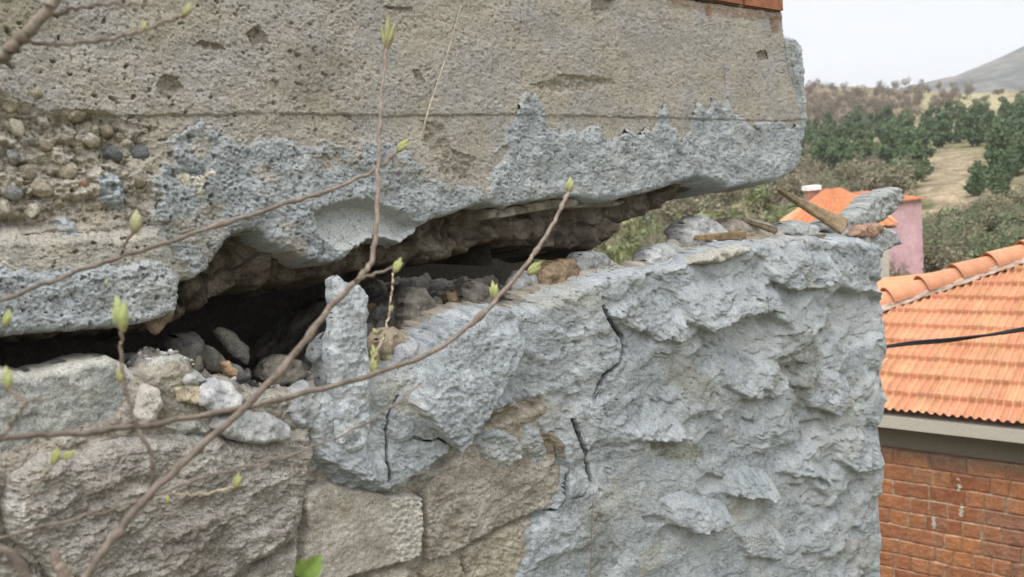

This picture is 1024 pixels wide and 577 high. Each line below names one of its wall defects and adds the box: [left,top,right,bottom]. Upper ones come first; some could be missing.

peeling [0,37,808,337]
spalling [367,326,410,361]
crack [381,385,458,491]
crack [413,299,627,566]